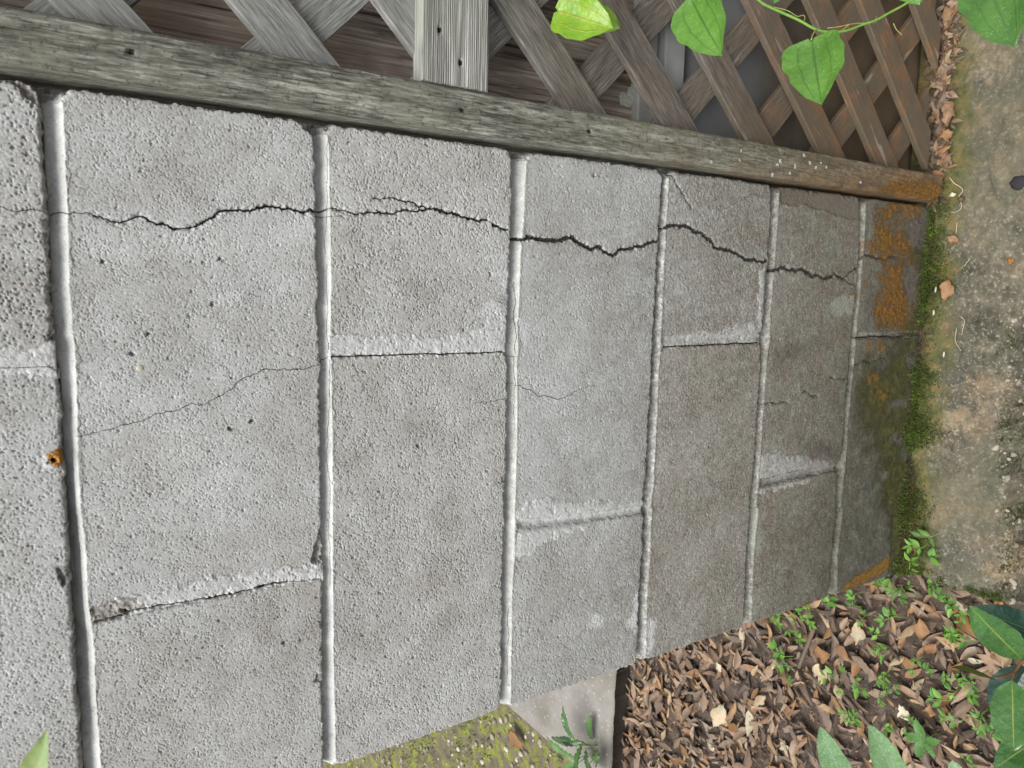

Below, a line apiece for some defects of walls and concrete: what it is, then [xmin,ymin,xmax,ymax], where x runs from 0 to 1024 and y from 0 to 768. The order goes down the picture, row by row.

crack [0,124,904,621]
corrosion [46,447,63,468]
water stain [842,558,890,591]